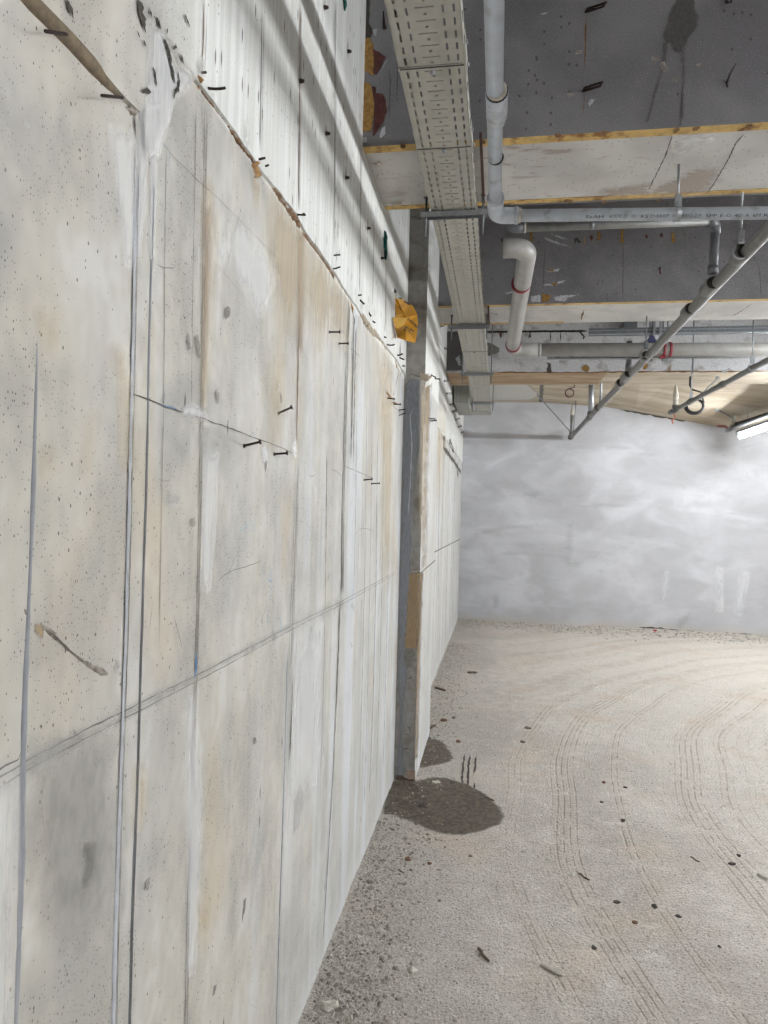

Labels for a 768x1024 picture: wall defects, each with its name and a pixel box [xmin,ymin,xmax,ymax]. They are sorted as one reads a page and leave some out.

leakage [646,0,700,133]
leakage [136,34,187,258]
crack [648,137,672,191]
crack [706,135,743,194]